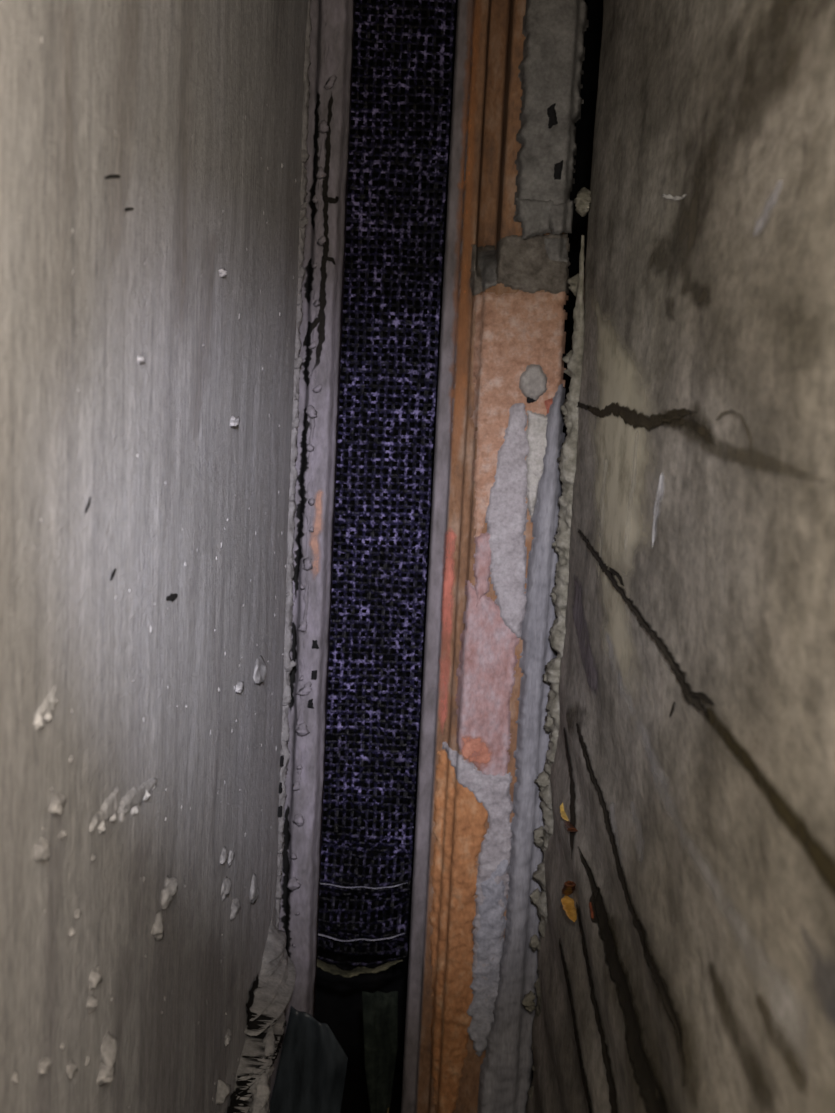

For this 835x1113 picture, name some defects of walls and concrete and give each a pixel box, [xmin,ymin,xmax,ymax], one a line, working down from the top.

crack [289,93,339,709]
crack [577,402,782,470]
peeling [216,1080,231,1105]
crack [281,806,292,957]
crack [559,723,695,1113]
crack [578,530,835,894]